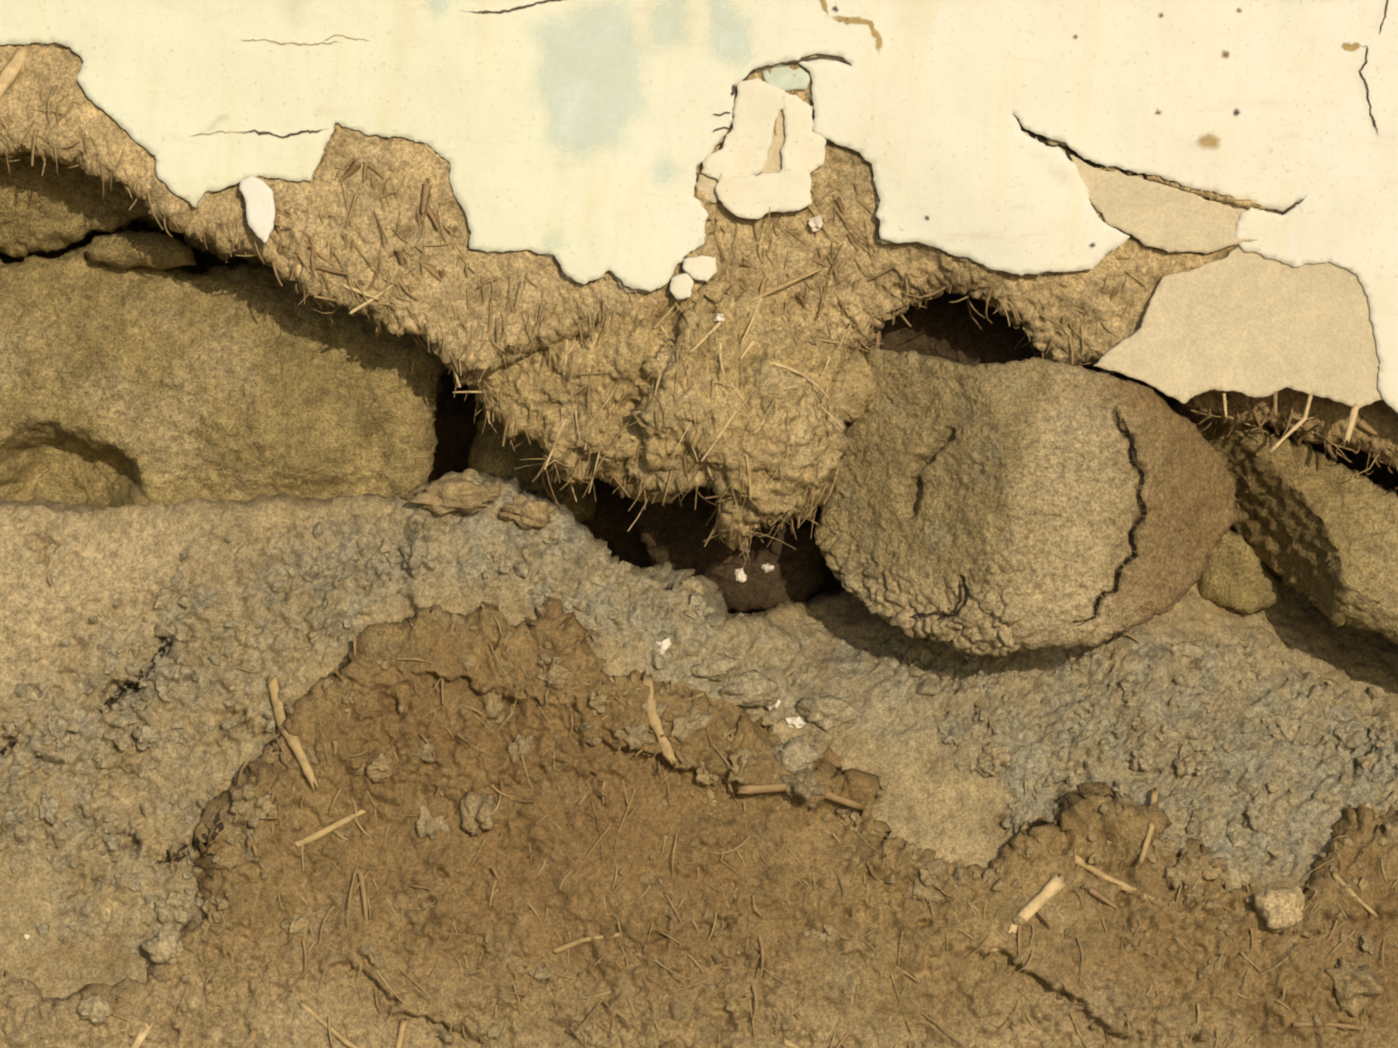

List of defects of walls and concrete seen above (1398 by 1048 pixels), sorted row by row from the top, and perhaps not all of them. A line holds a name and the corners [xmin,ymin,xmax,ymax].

crack [243,34,368,46]
crack [470,0,562,14]
crack [1359,0,1388,133]
crack [193,130,321,138]
crack [1017,120,1221,202]
spalling [0,43,1398,489]
crack [1076,410,1147,626]